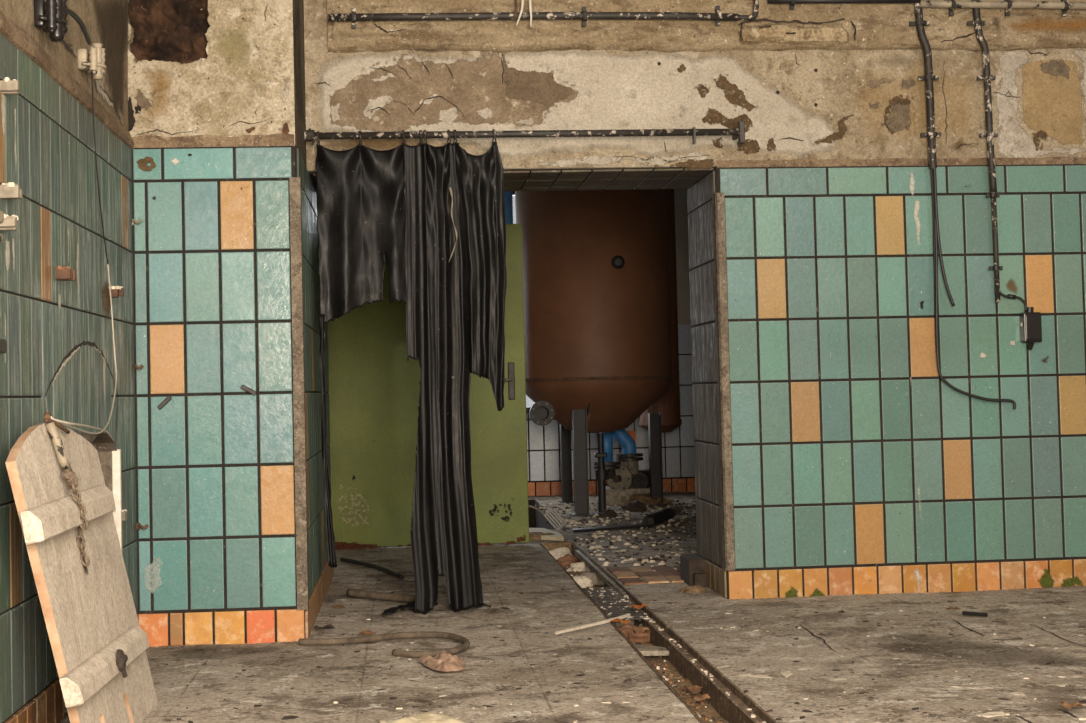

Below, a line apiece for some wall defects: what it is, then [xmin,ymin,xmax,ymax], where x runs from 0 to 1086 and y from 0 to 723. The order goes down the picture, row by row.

spalling [128,0,210,64]
peeling [330,50,578,132]
peeling [639,74,776,170]
peeling [814,114,854,144]
spalling [866,76,916,134]
spalling [1032,130,1047,151]